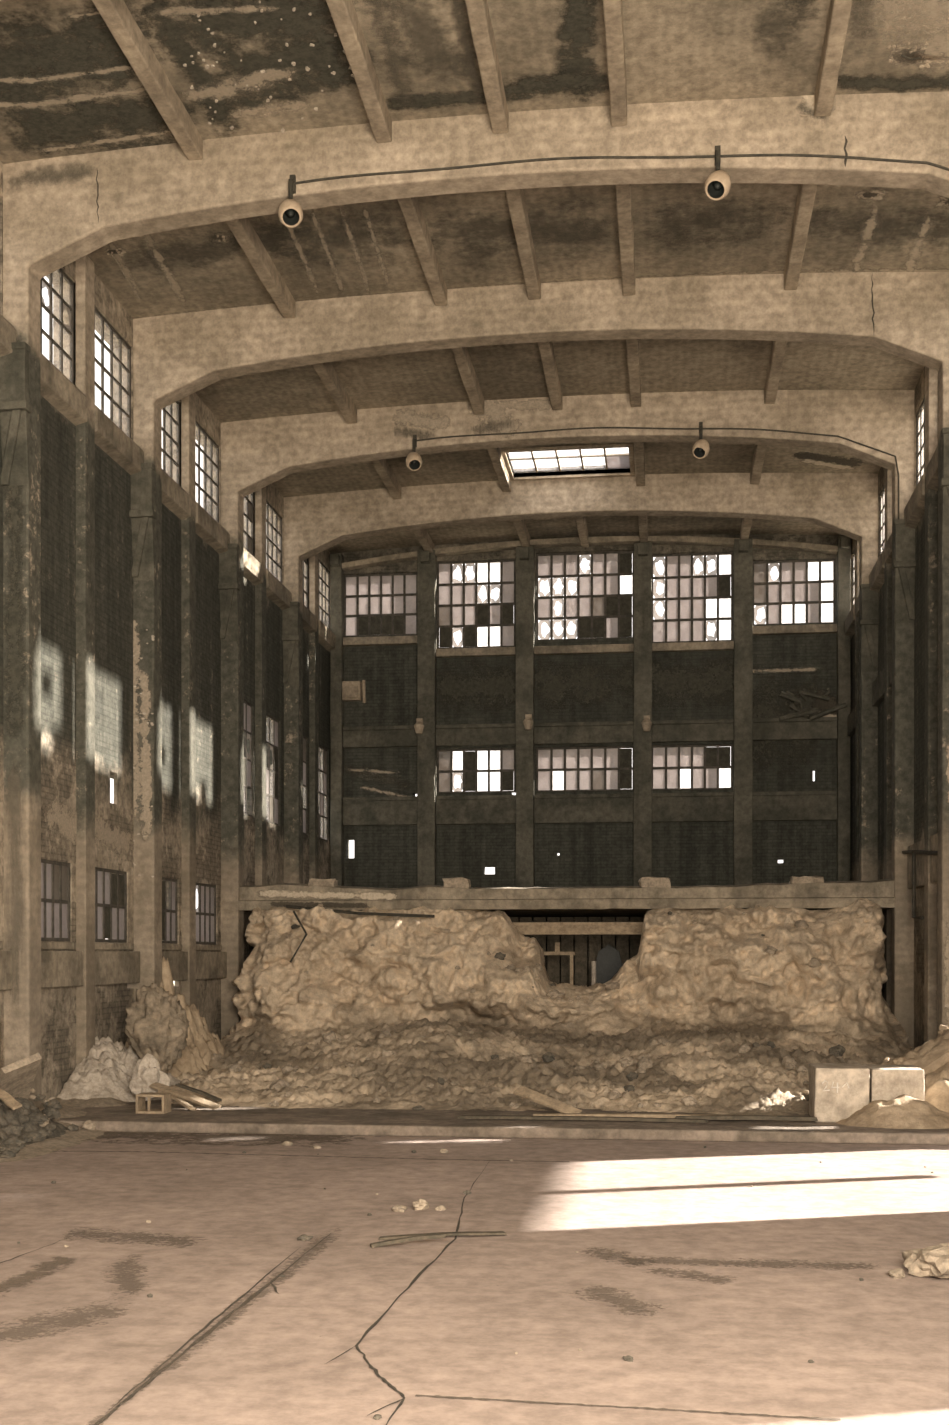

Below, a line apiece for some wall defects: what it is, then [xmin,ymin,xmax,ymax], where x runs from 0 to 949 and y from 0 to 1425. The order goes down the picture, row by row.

water stain [160,5,277,16]
water stain [838,0,949,93]
water stain [0,65,131,84]
water stain [0,86,145,109]
water stain [43,131,171,151]
crack [64,1151,841,1425]